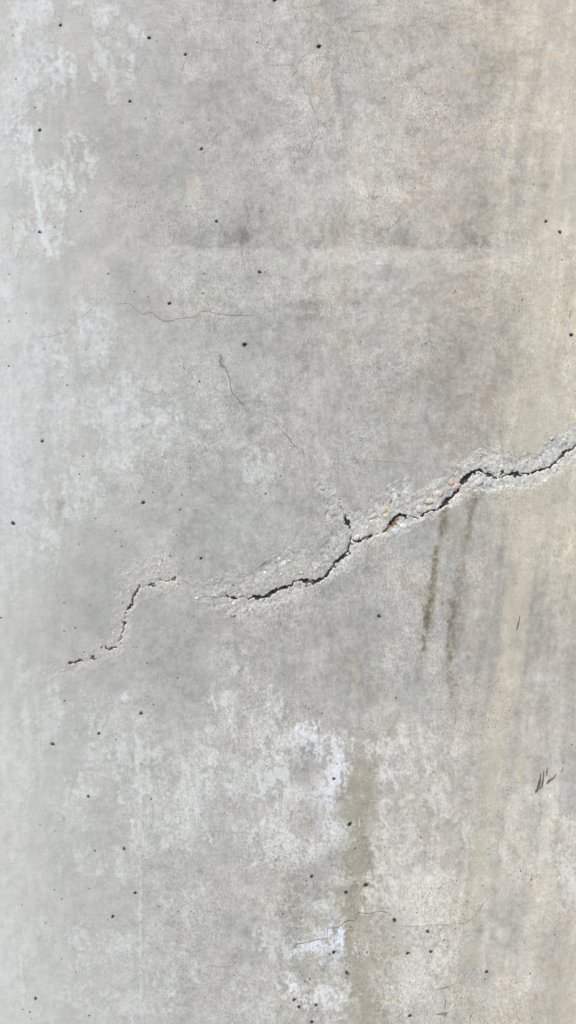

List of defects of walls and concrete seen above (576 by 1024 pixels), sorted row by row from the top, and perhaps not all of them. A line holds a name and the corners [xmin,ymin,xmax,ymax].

leakage [416,0,576,459]
crack [69,515,373,665]
leakage [0,474,576,1024]
crack [395,450,571,518]